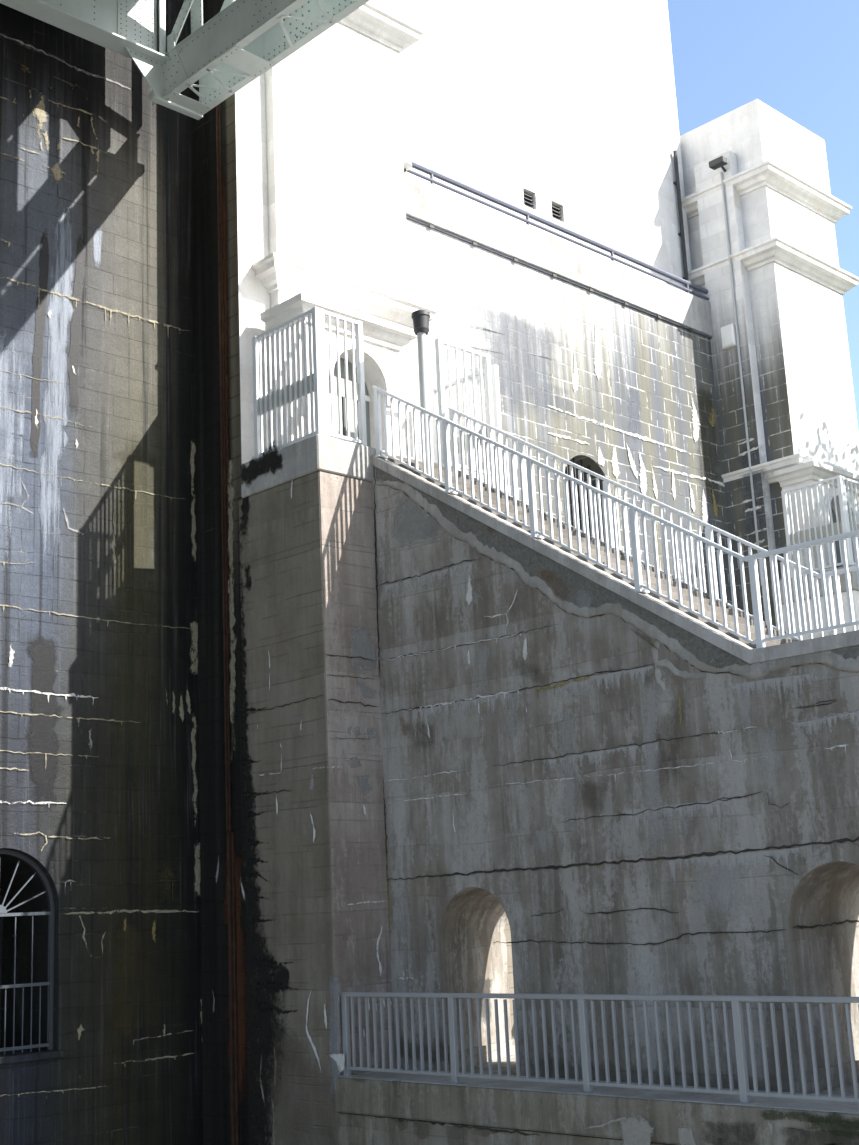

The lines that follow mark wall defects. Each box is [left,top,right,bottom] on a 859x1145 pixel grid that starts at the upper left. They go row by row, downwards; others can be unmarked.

damp [0,90,197,570]
damp [487,311,725,523]
damp [0,636,140,806]
damp [0,605,198,674]
damp [63,909,197,942]
damp [166,690,198,823]
damp [227,441,345,1145]
crack [246,465,652,714]
crack [493,729,743,766]
crack [383,787,859,899]
damp [506,666,814,833]
crack [494,908,859,945]